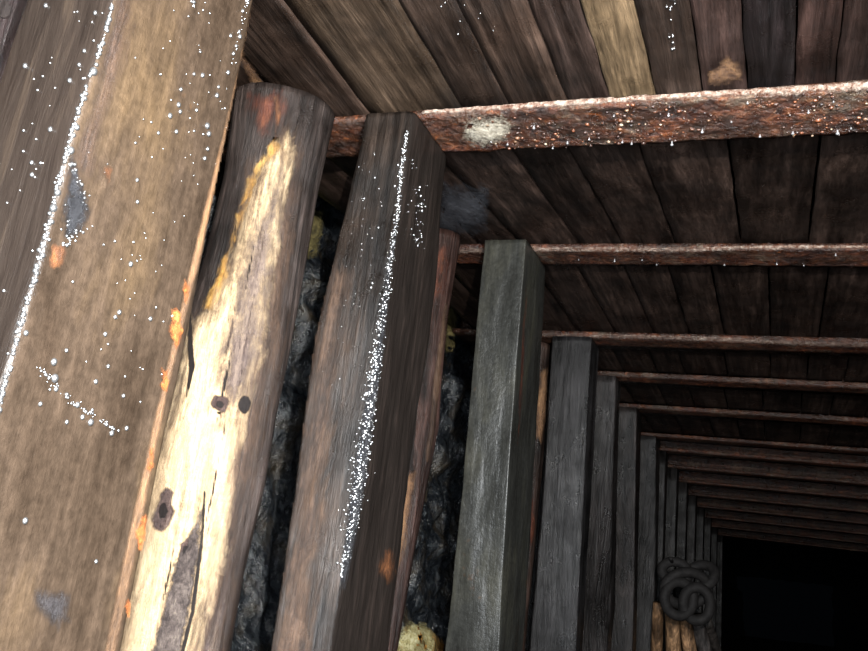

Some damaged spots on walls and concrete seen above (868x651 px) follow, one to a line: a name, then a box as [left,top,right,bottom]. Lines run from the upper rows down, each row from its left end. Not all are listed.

leakage [0,0,129,413]
corrosion [477,102,722,150]
corrosion [752,89,868,137]
leakage [36,367,120,432]
corrosion [106,80,237,651]
crack [181,471,217,651]